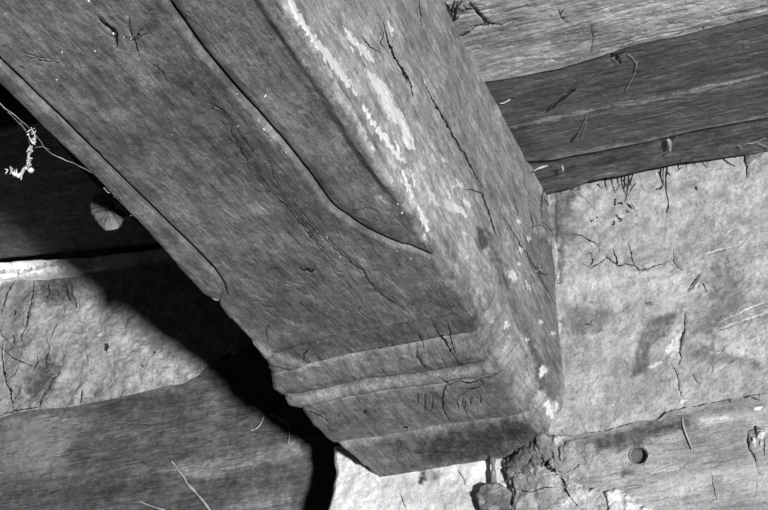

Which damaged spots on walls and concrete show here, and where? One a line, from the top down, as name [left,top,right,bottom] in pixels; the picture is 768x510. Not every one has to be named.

crack [209,105,407,312]
crack [362,22,556,304]
crack [573,234,707,293]
crack [0,261,77,416]
crack [416,321,503,421]
crack [671,314,699,394]
spalling [530,432,557,460]